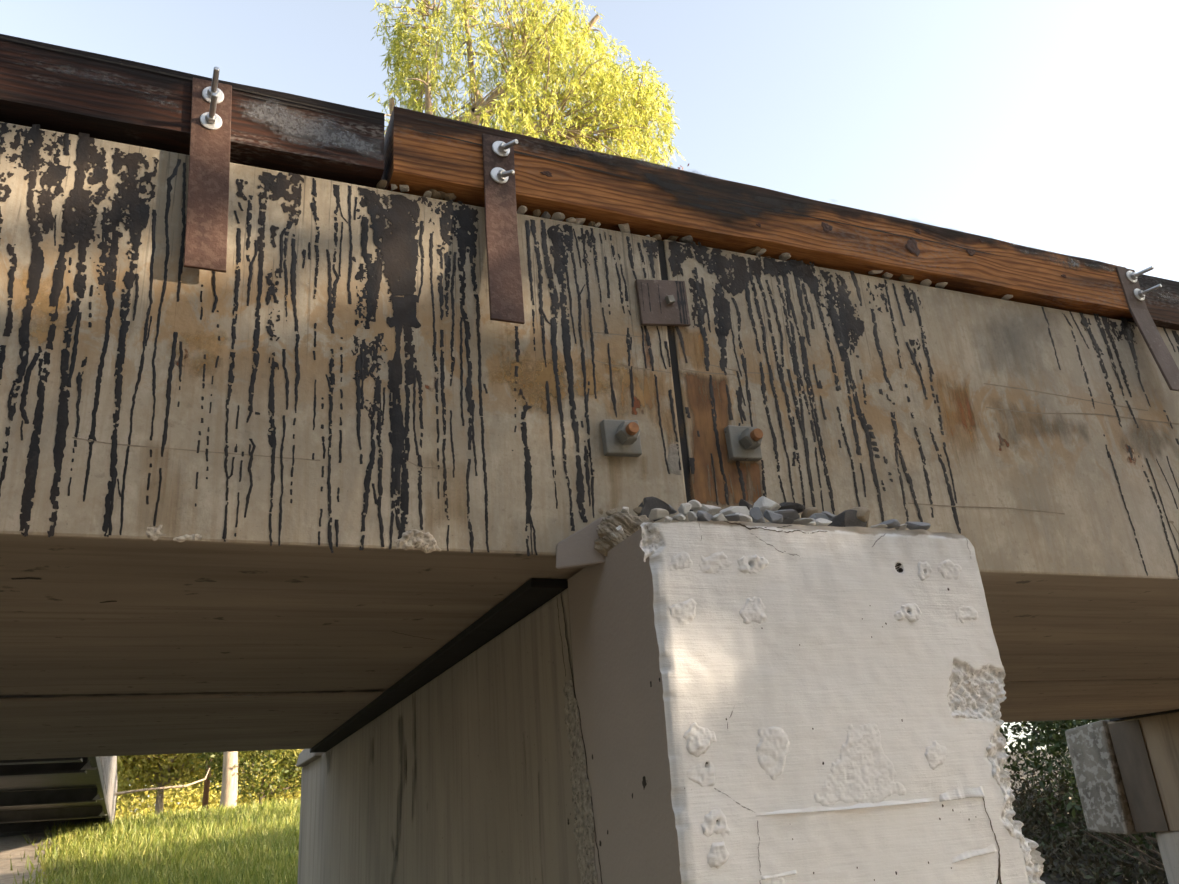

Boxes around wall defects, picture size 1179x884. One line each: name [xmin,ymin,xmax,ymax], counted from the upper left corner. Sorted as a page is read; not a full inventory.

rust [621,375,657,415]
spalling [145,524,202,542]
spalling [394,529,441,553]
spalling [594,512,666,562]
crack [557,589,602,883]
spalling [947,661,1046,884]